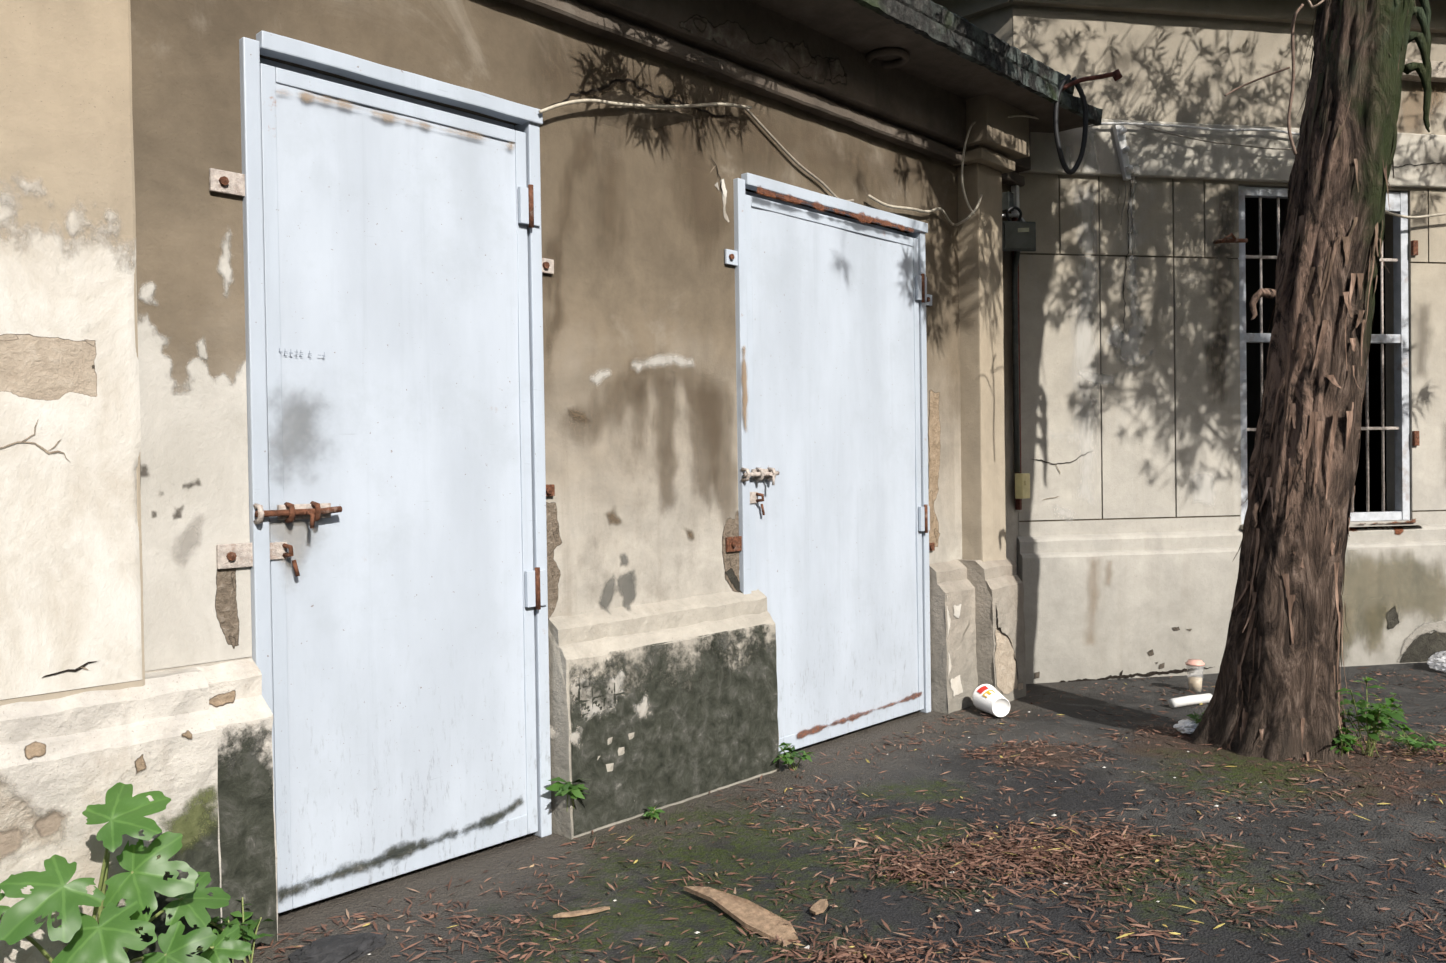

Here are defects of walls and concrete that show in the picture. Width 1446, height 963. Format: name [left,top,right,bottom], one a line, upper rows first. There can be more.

rust [757,186,914,232]
crack [0,420,69,461]
peeling [0,180,252,700]
leakage [600,554,636,610]
leakage [1341,559,1446,653]
peeling [946,595,963,697]
flaking render [995,629,1040,694]
flaking render [24,741,46,760]
flaking render [209,690,236,707]
mould [570,625,779,836]
rust [797,692,922,738]
mould [123,728,277,963]